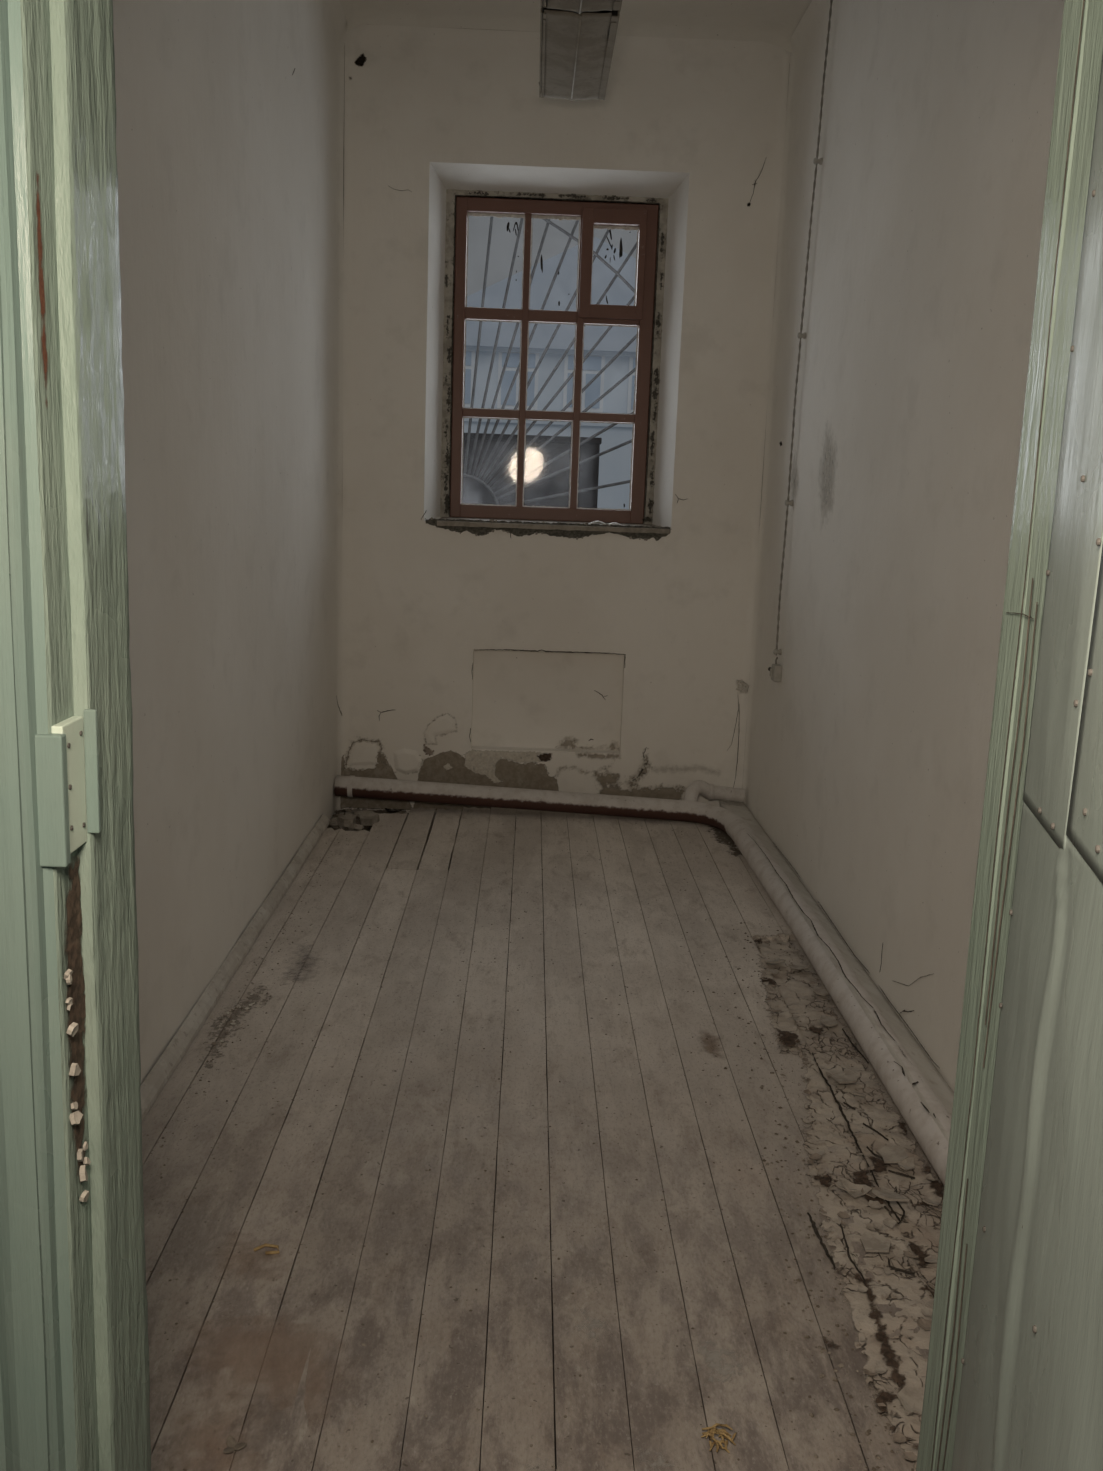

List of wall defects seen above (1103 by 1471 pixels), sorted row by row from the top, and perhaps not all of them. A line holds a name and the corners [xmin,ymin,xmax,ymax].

spalling [472,649,626,680]
flaking render [341,752,397,779]
flaking render [418,728,559,791]
flaking render [330,796,491,831]
peeling [807,1149,885,1231]